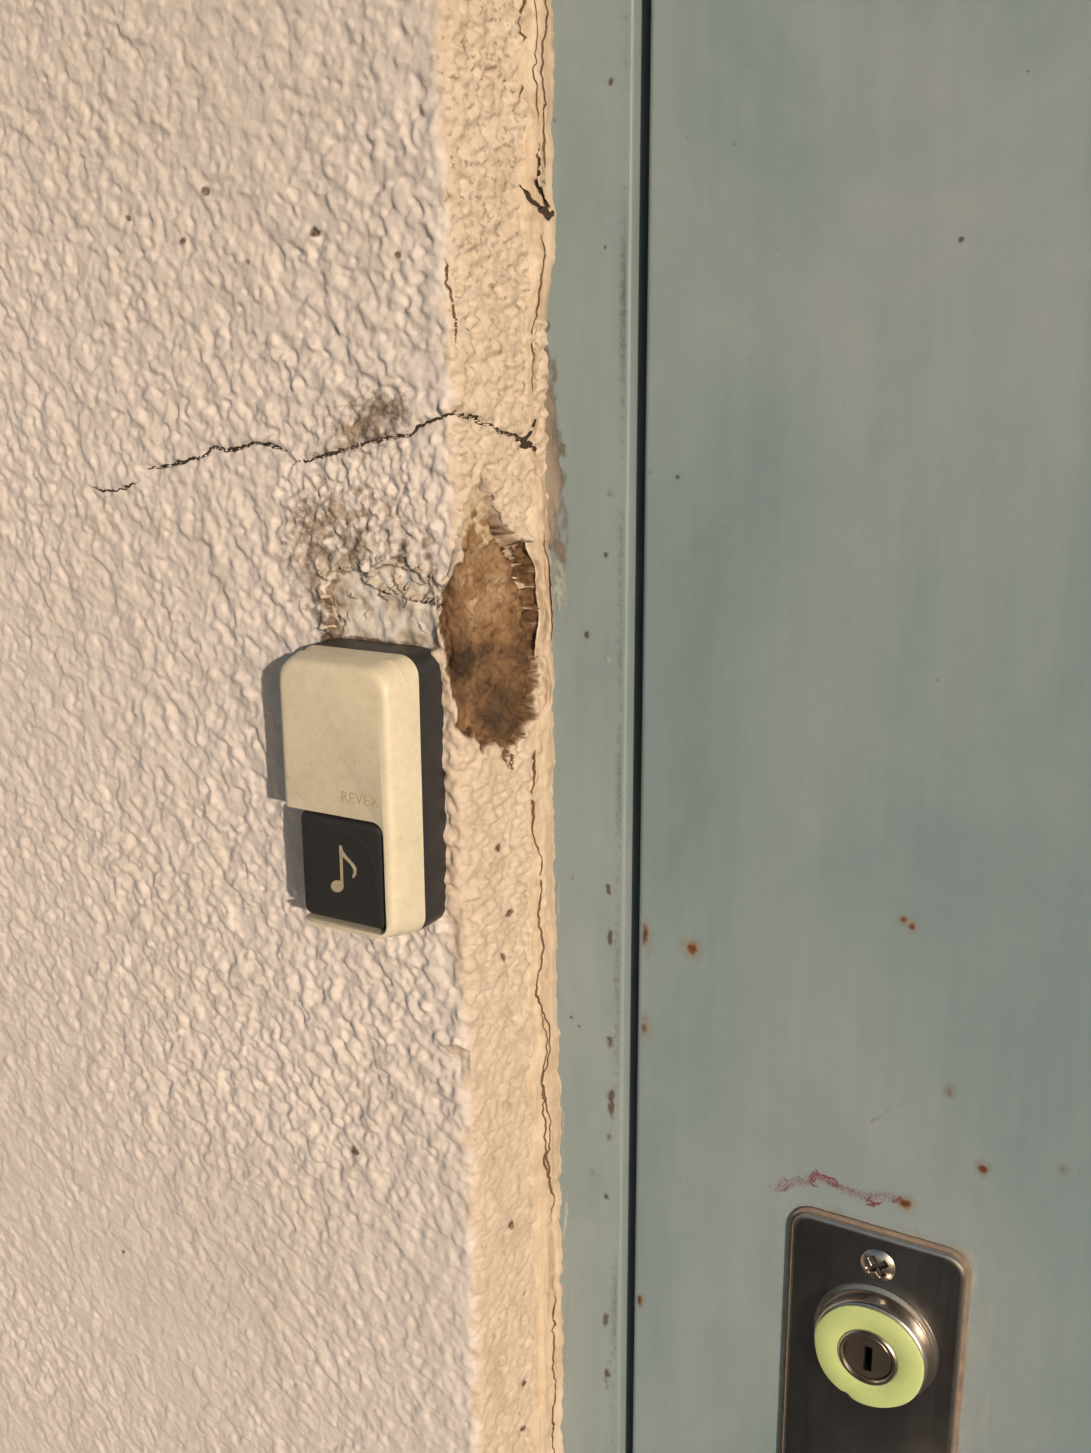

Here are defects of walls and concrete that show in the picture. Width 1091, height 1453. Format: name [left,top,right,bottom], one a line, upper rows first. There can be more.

crack [94,410,537,493]
spalling [316,474,534,770]